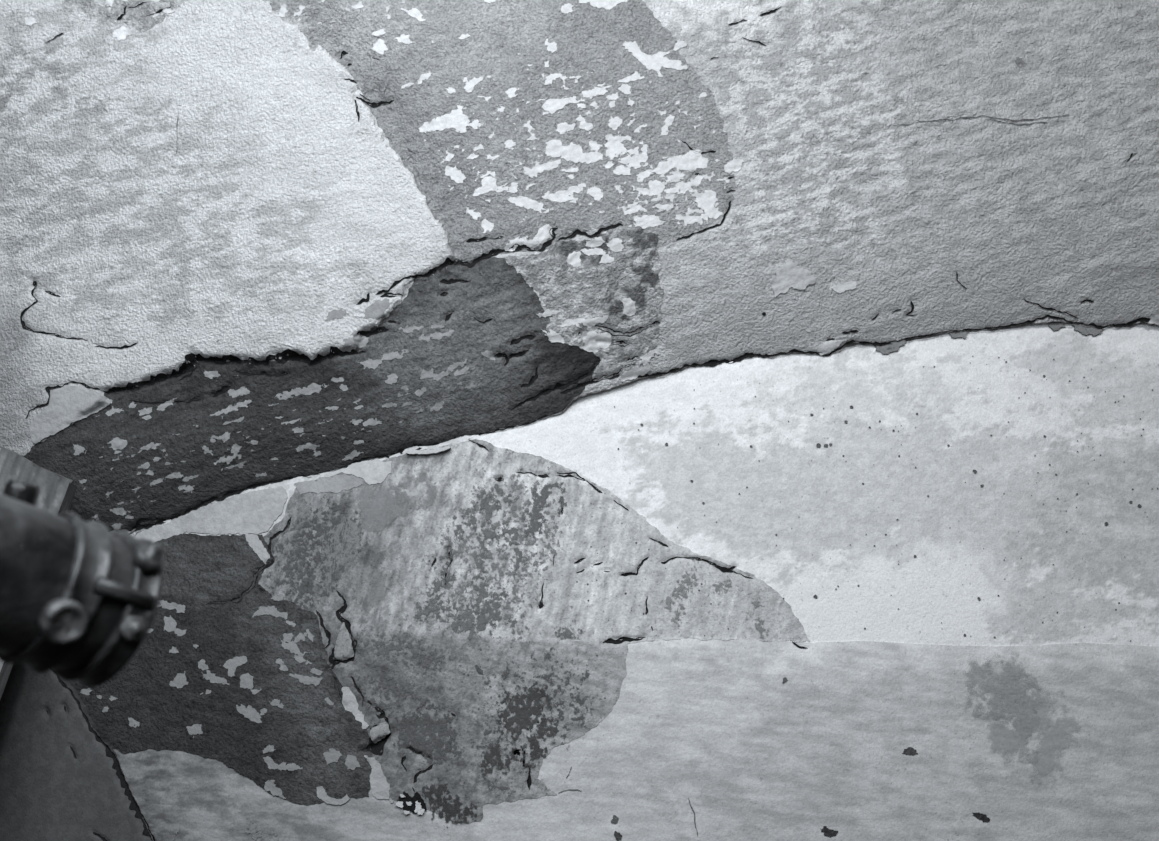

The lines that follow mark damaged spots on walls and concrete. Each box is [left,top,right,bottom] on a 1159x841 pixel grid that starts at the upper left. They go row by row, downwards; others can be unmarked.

crack [20,223,623,419]
flaking render [22,0,744,532]
crack [129,299,1151,534]
crack [431,551,453,585]
flaking render [68,533,391,805]
flaking render [394,792,427,815]
crack [525,767,533,790]
spalling [611,815,622,841]
damp [966,659,1079,783]